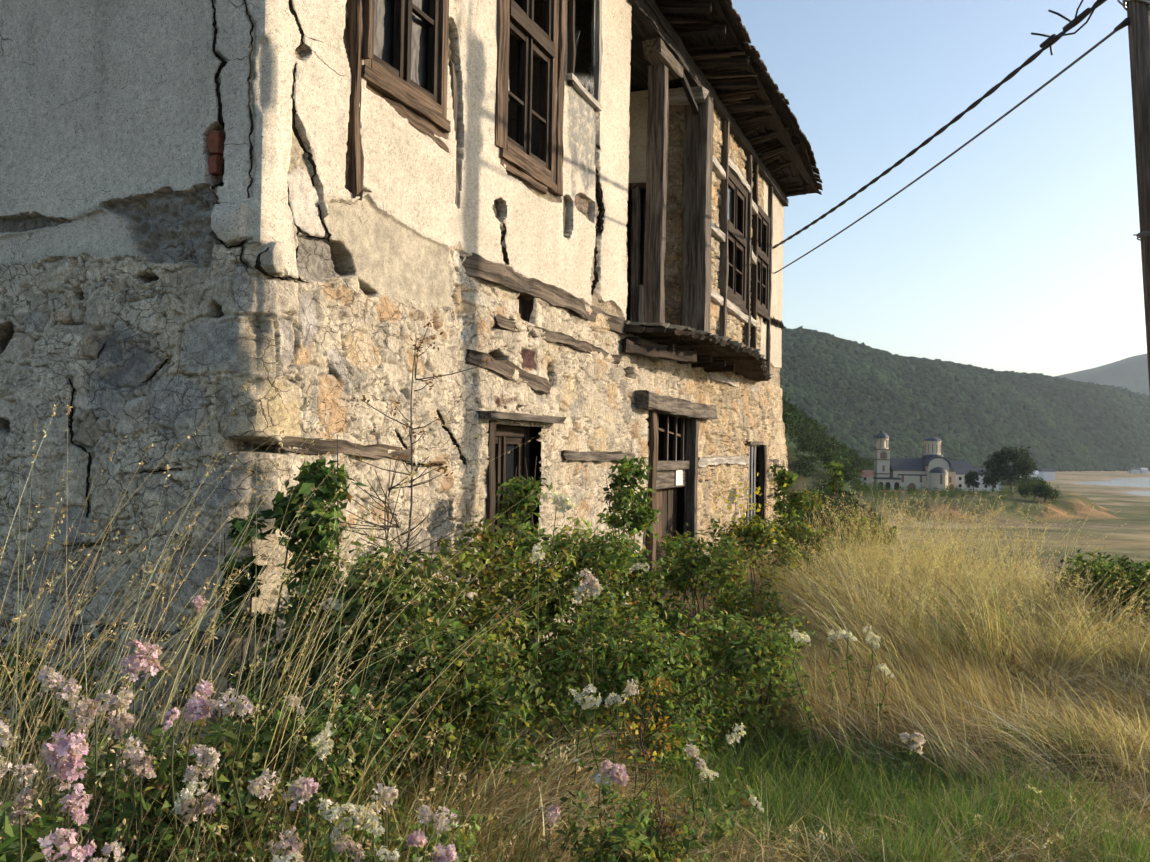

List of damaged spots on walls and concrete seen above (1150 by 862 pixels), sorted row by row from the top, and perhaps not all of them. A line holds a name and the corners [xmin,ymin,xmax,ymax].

spalling [0,211,72,233]
spalling [100,121,227,269]
crack [211,0,254,204]
crack [218,0,363,283]
peeling [287,112,514,309]
crack [500,223,509,265]
spalling [507,173,625,319]
crack [587,66,605,295]
crack [60,378,110,546]
crack [366,382,467,467]